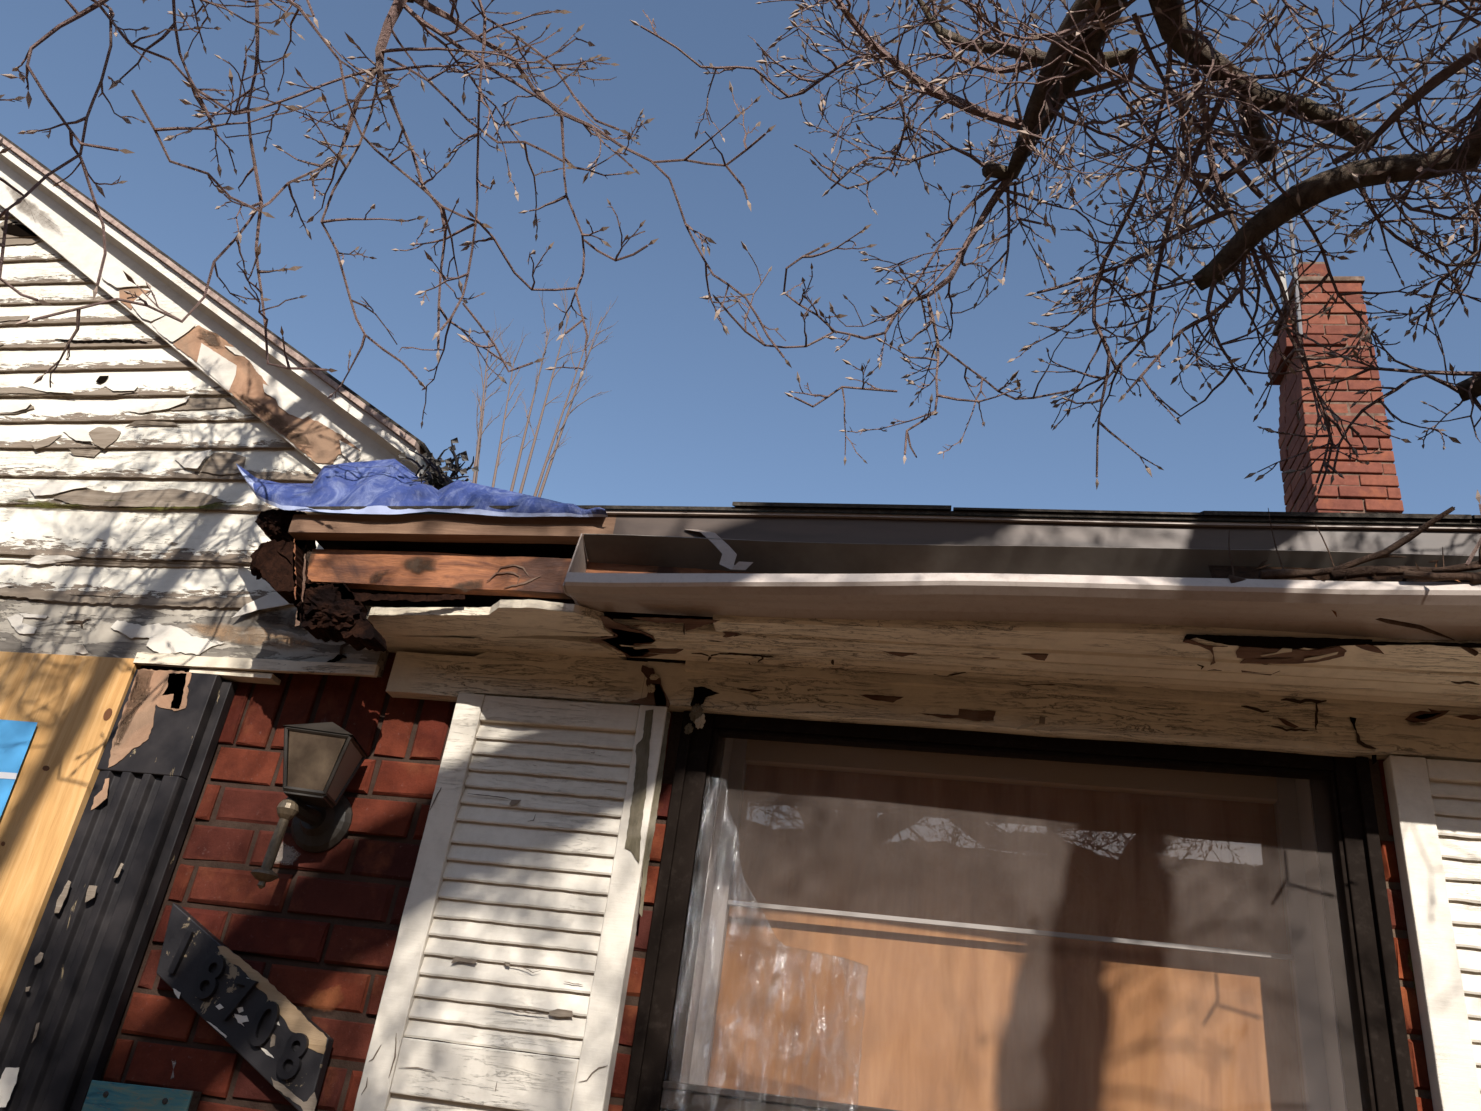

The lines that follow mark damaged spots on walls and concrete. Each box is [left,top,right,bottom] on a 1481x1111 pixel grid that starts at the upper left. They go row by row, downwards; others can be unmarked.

peeling [0,266,361,464]
peeling [175,450,246,475]
peeling [28,482,224,507]
peeling [827,651,917,675]
peeling [1183,634,1384,675]
peeling [861,694,903,703]
peeling [919,709,996,721]
spalling [54,880,97,913]
peeling [217,946,327,1058]
spalling [207,1004,249,1038]
spalling [0,1067,19,1107]
spalling [271,1077,317,1111]